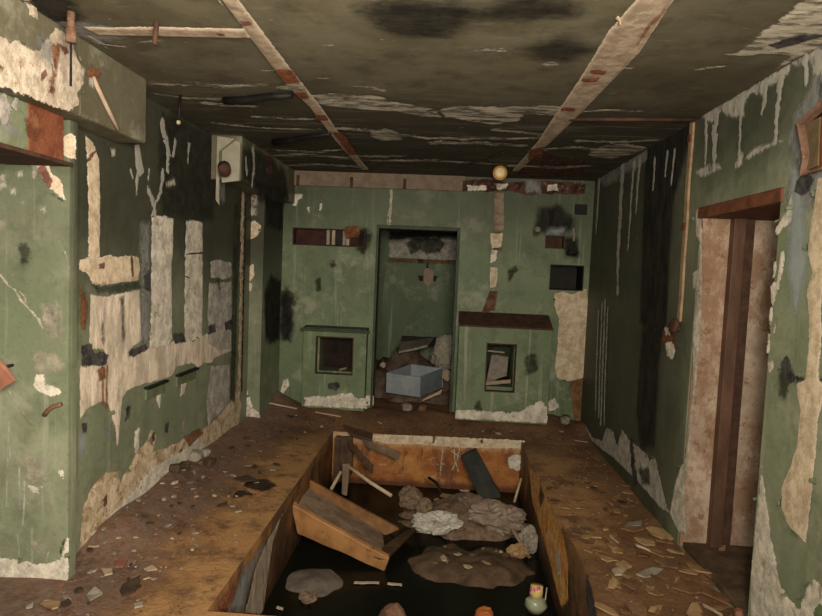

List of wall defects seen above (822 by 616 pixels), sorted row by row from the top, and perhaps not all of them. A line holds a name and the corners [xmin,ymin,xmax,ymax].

rust [25,113,41,141]
spalling [0,27,94,111]
water stain [696,0,822,309]
flaking render [63,134,260,552]
peeling [303,382,374,409]
peeling [455,398,559,436]
peeling [553,289,588,382]
peeling [586,209,703,533]
peeling [766,174,822,542]
peeling [0,537,84,600]
spalling [207,420,597,616]
peeling [750,465,822,616]